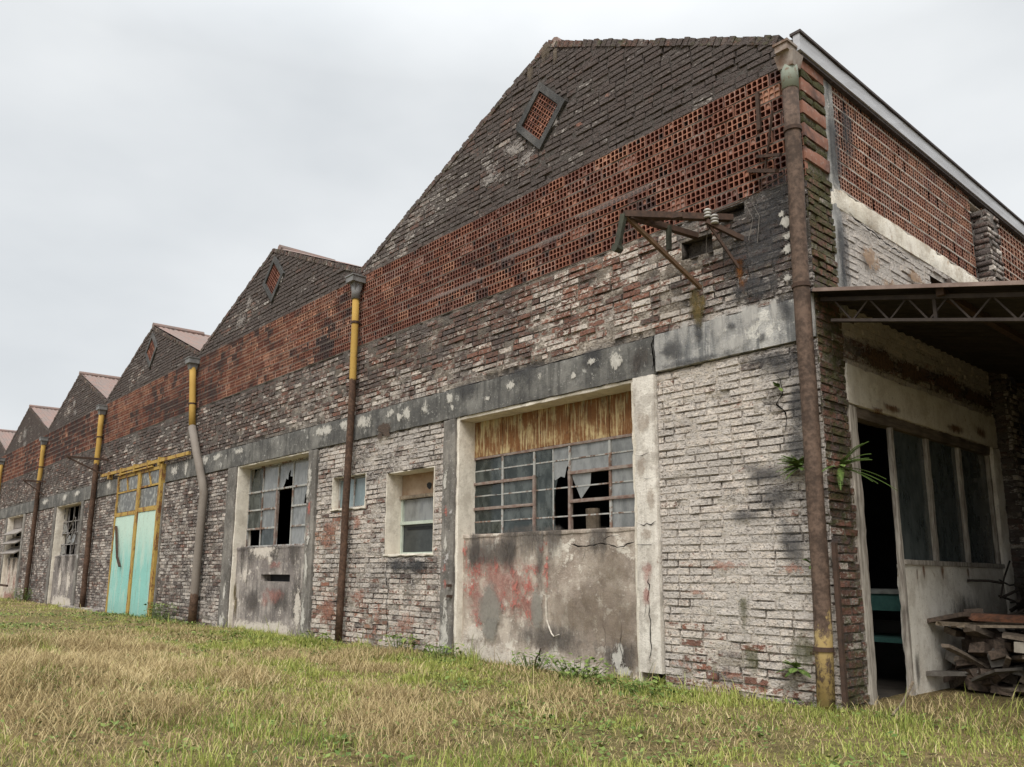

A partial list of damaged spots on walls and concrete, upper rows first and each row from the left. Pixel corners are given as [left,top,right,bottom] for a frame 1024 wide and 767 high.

water stain [664,176,788,366]
water stain [790,388,801,417]
water stain [233,546,301,637]
flaking render [462,541,559,639]
water stain [468,525,561,571]
water stain [460,625,632,676]
crack [567,522,654,558]
crack [602,575,652,665]